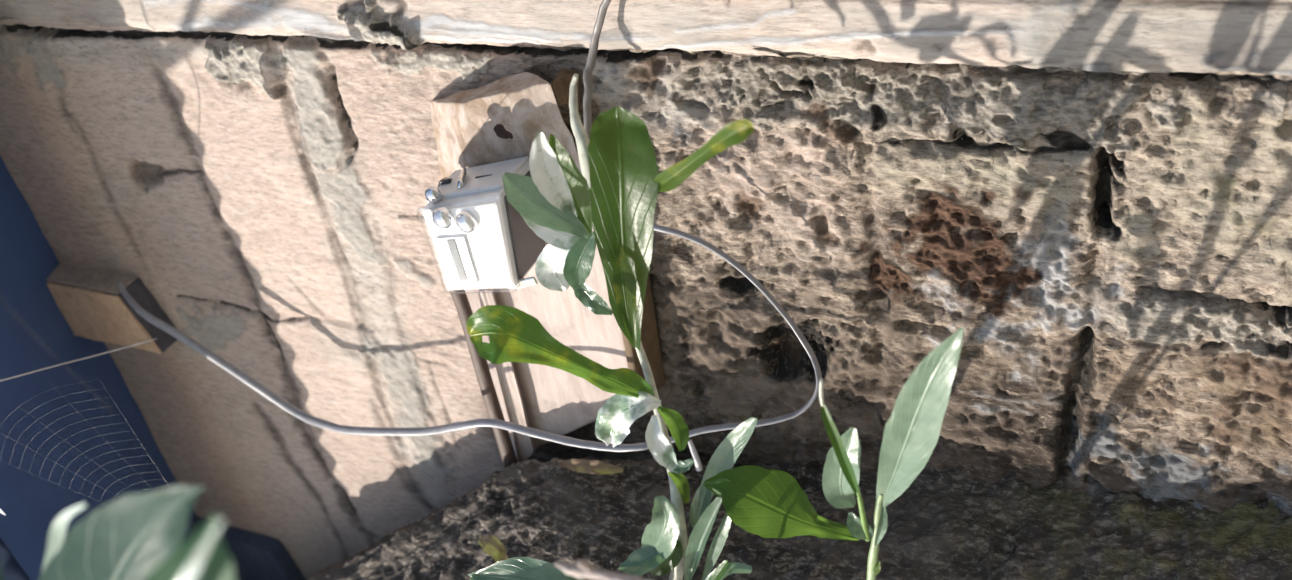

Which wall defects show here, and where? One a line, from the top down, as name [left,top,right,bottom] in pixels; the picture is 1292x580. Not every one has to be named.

crack [3,24,861,176]
crack [1139,72,1292,89]
crack [873,131,1124,241]
leakage [531,424,592,461]
leakage [639,254,955,465]
corrosion [855,179,1056,316]
leakage [1010,219,1089,329]
crack [1055,326,1114,494]
spalling [1087,286,1292,357]